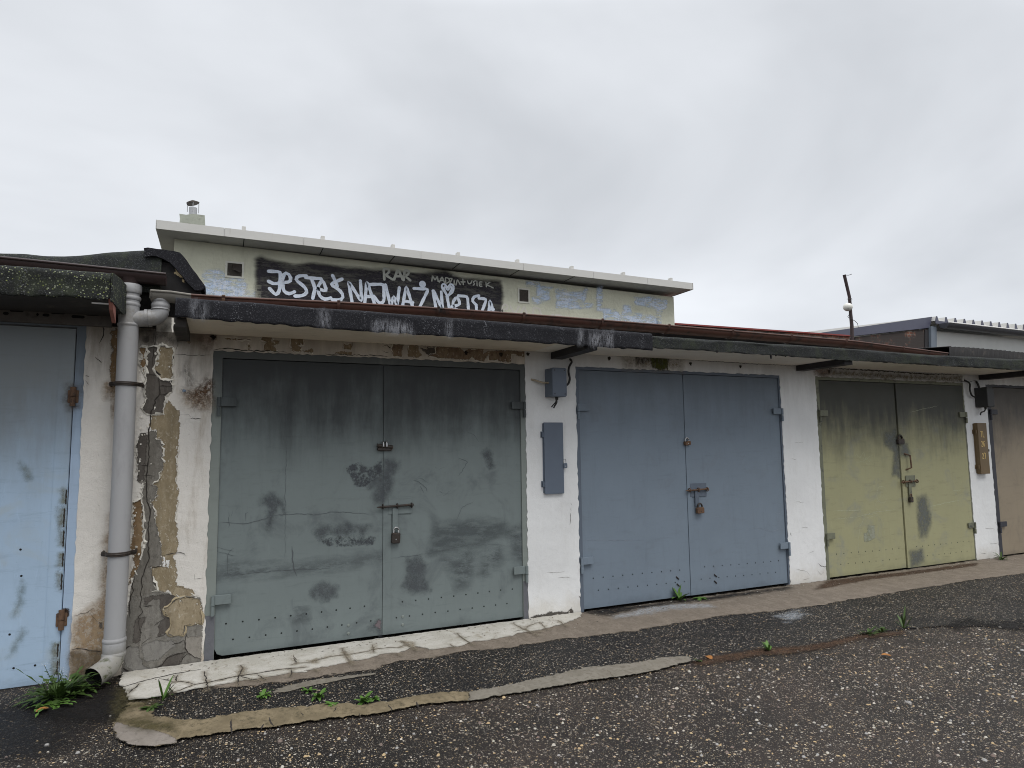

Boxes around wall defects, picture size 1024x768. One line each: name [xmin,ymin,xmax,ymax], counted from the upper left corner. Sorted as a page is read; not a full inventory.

peeling [215,337,313,354]
peeling [328,343,524,363]
damp [185,384,210,404]
peeling [121,343,205,675]
crack [119,335,417,697]